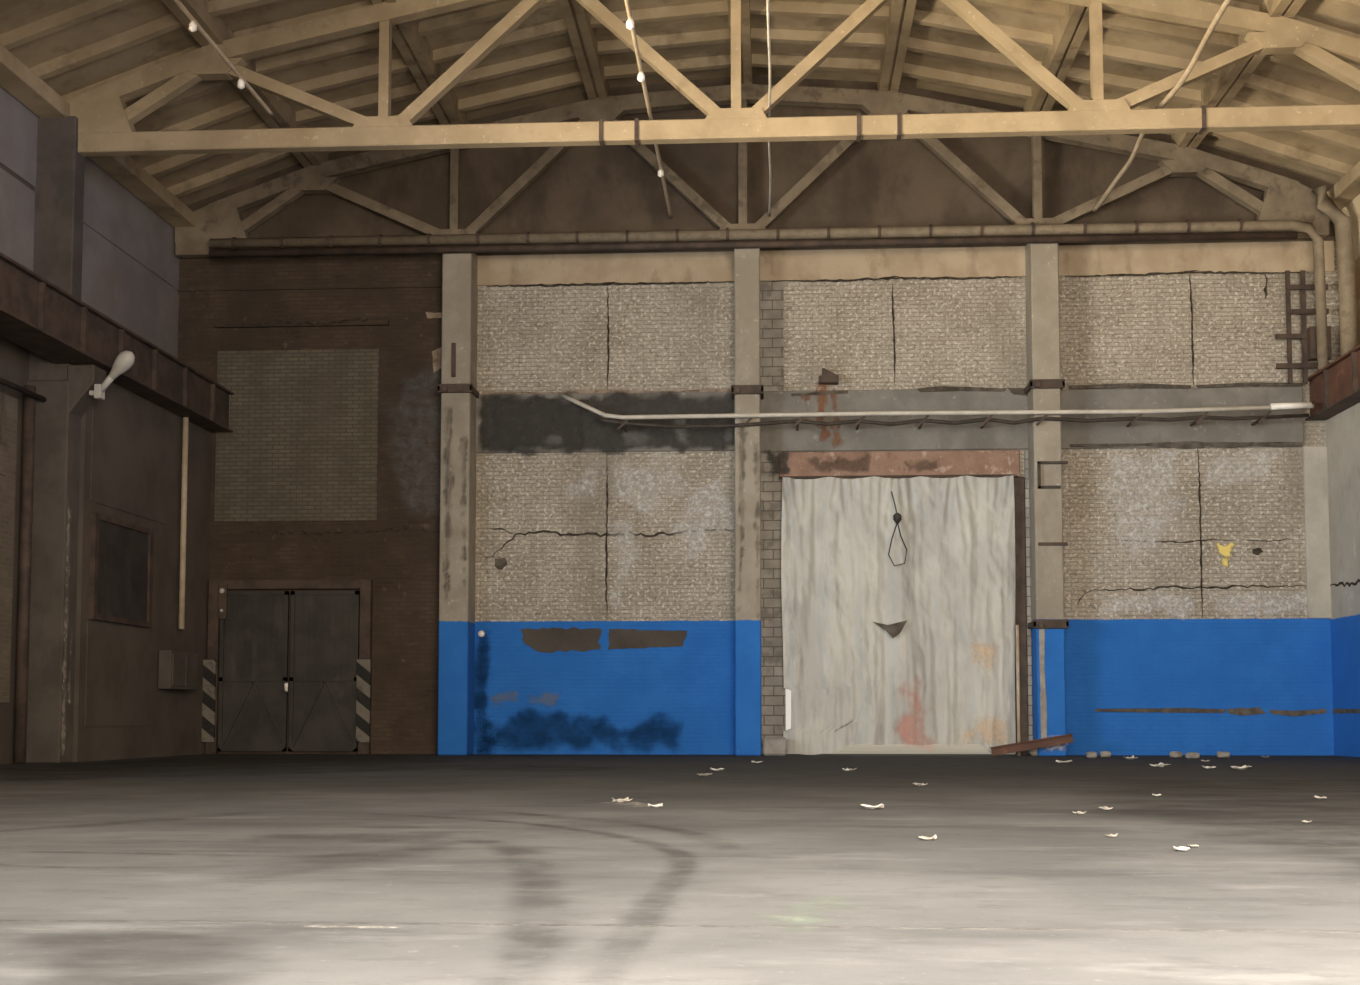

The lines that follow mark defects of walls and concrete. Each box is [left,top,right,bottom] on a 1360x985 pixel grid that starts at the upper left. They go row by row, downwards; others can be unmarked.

rust [806,383,840,444]
crack [486,454,734,610]
crack [1077,448,1360,615]
peeling [520,627,687,653]
peeling [1095,707,1360,716]